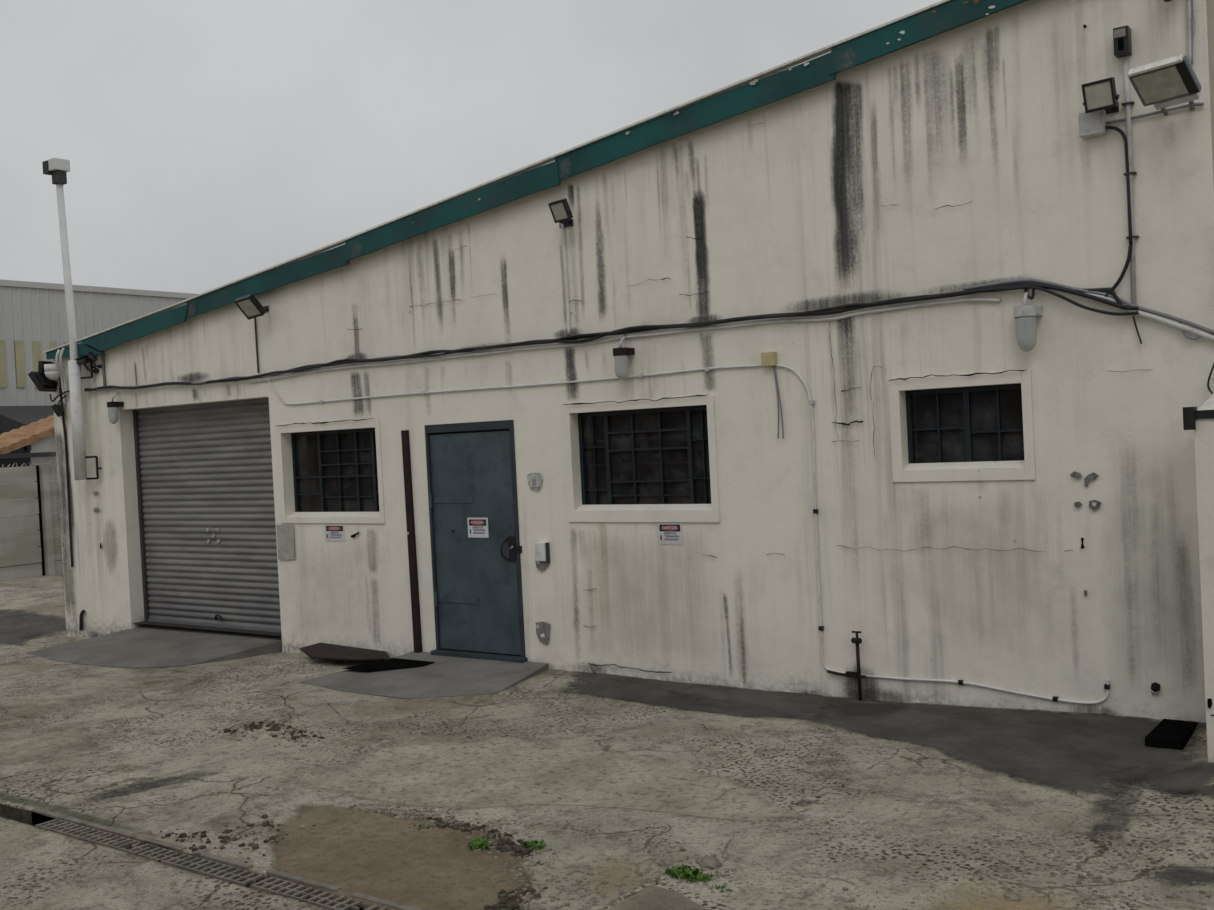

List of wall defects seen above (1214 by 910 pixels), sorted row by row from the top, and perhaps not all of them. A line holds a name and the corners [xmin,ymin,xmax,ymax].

water stain [951,65,966,142]
water stain [832,83,876,278]
water stain [434,241,455,317]
water stain [690,194,717,388]
water stain [797,293,890,390]